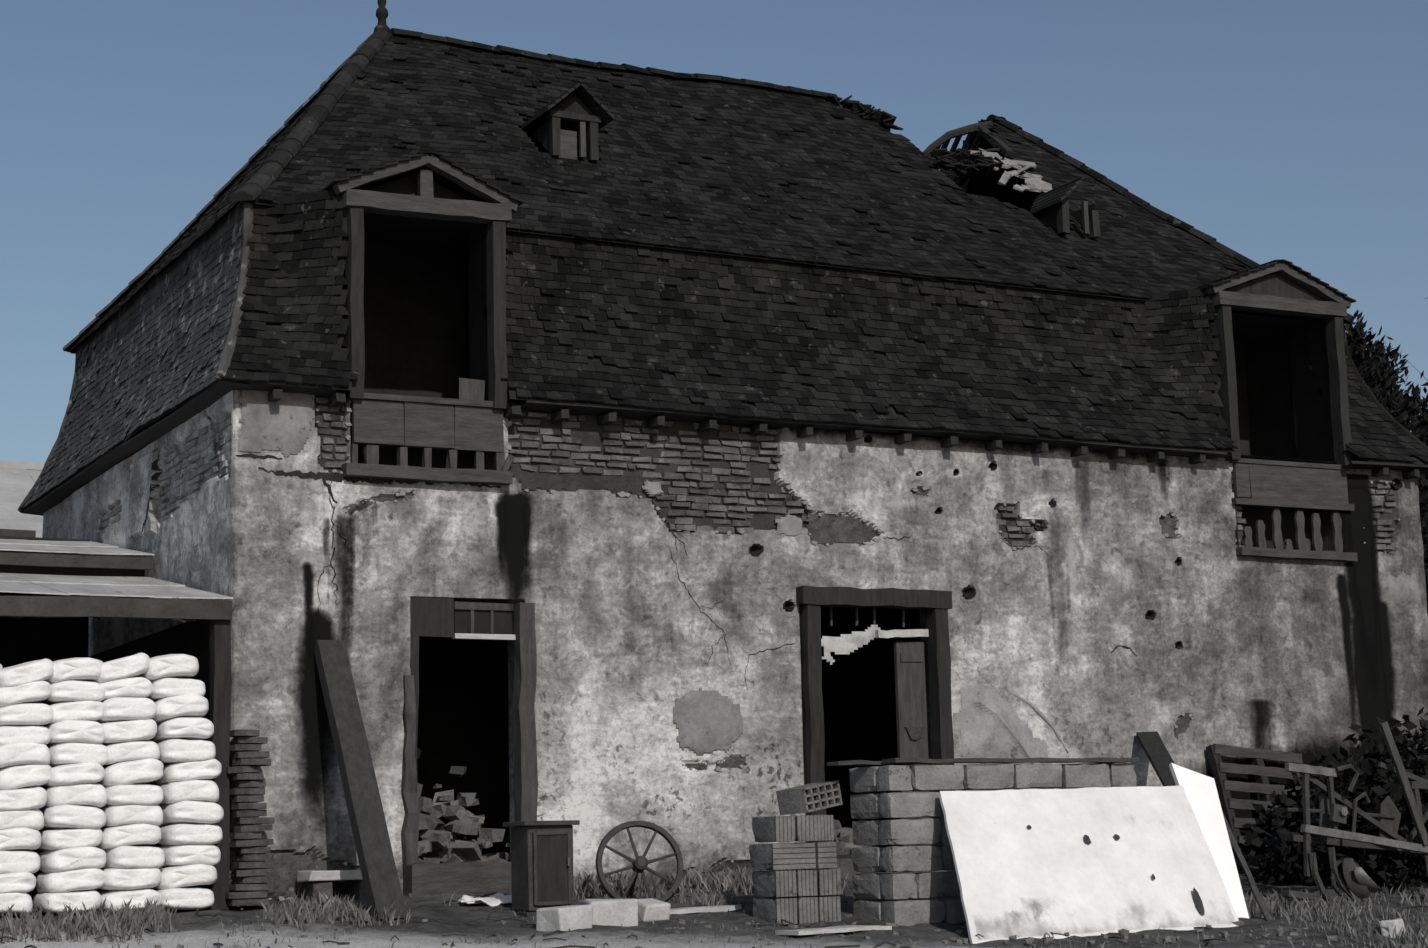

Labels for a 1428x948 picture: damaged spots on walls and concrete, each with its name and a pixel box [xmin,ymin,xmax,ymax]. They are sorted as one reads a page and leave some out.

flaking render [159,412,232,523]
flaking render [315,392,352,474]
water stain [497,492,530,608]
flaking render [504,397,886,556]
flaking render [993,500,1057,550]